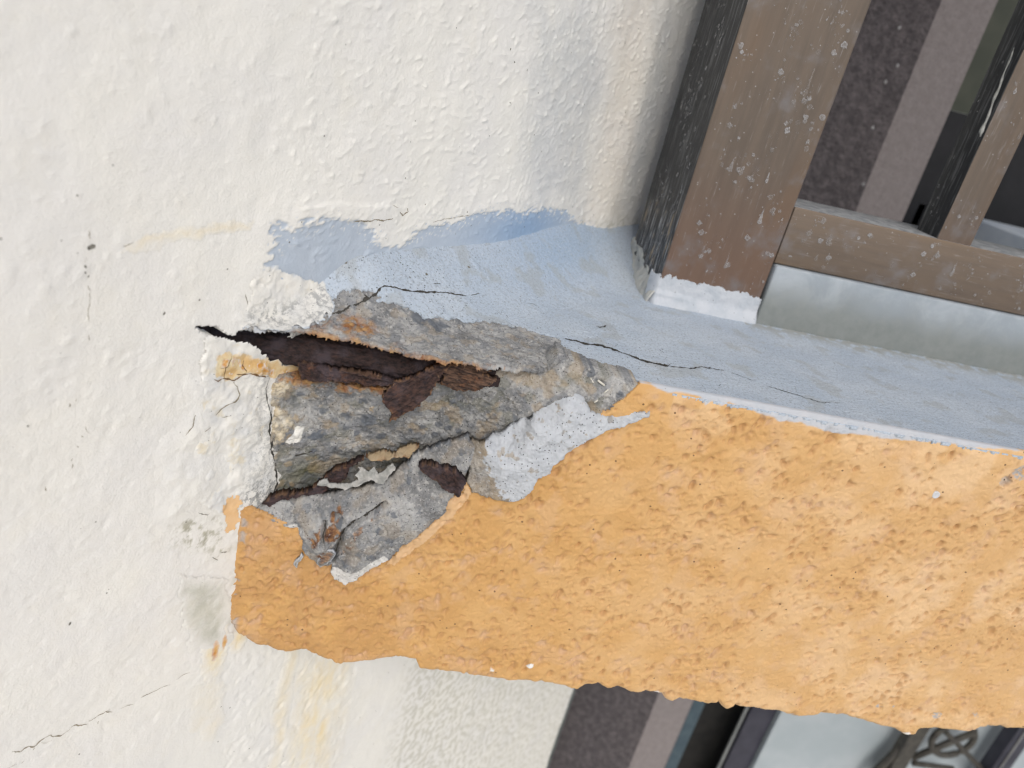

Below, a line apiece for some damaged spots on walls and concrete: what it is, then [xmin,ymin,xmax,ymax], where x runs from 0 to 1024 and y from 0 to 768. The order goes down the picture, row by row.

crack [326,283,480,314]
rust [196,326,500,423]
crack [565,325,829,403]
spalling [195,265,650,585]
rust [262,452,367,507]
rust [418,458,466,498]